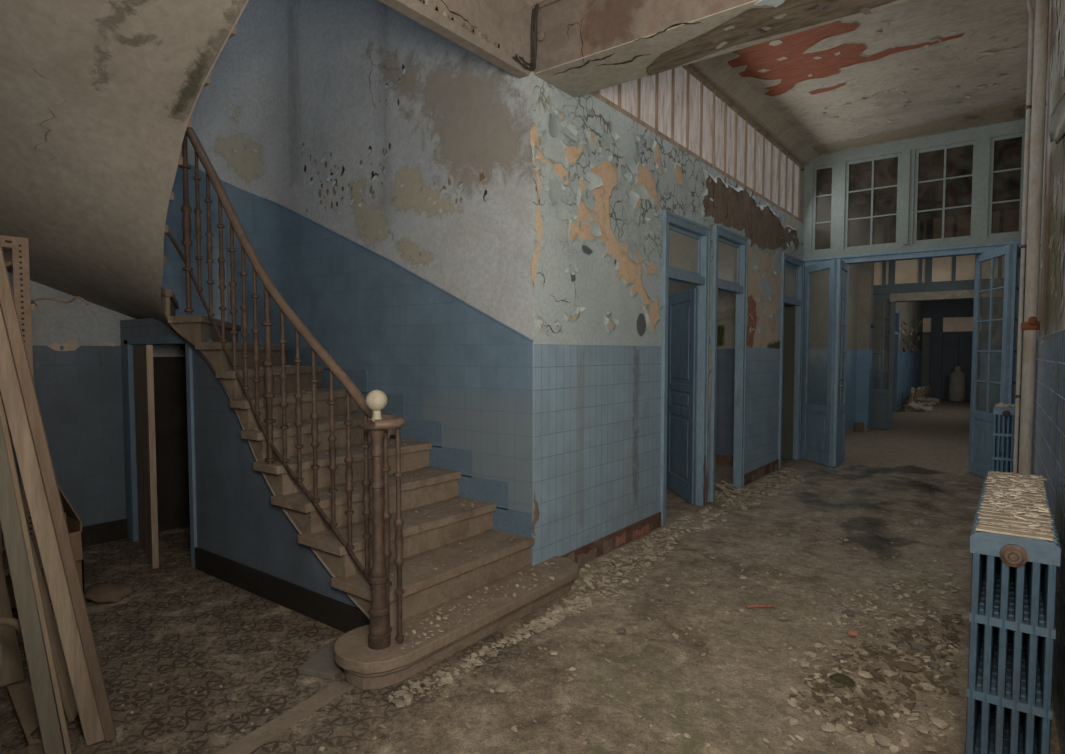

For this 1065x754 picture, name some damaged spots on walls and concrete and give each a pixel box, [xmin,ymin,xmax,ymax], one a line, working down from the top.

crack [441,0,479,31]
crack [567,16,585,63]
flaking render [554,0,965,97]
peeling [301,143,391,212]
peeling [530,108,799,349]